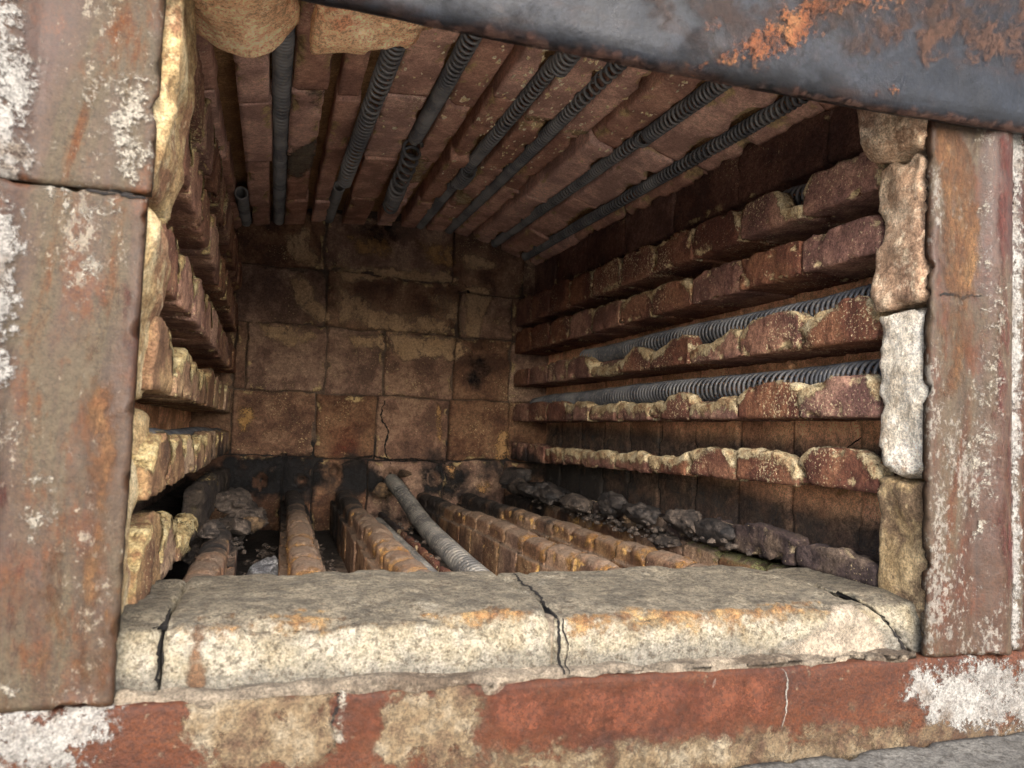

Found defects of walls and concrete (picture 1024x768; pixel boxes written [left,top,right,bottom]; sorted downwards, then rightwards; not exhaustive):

corrosion [522,0,1024,396]
corrosion [87,387,116,511]
crack [341,400,446,465]
corrosion [999,518,1014,589]
crack [152,608,172,687]
crack [514,573,570,674]
crack [831,591,906,650]
corrosion [491,668,781,741]